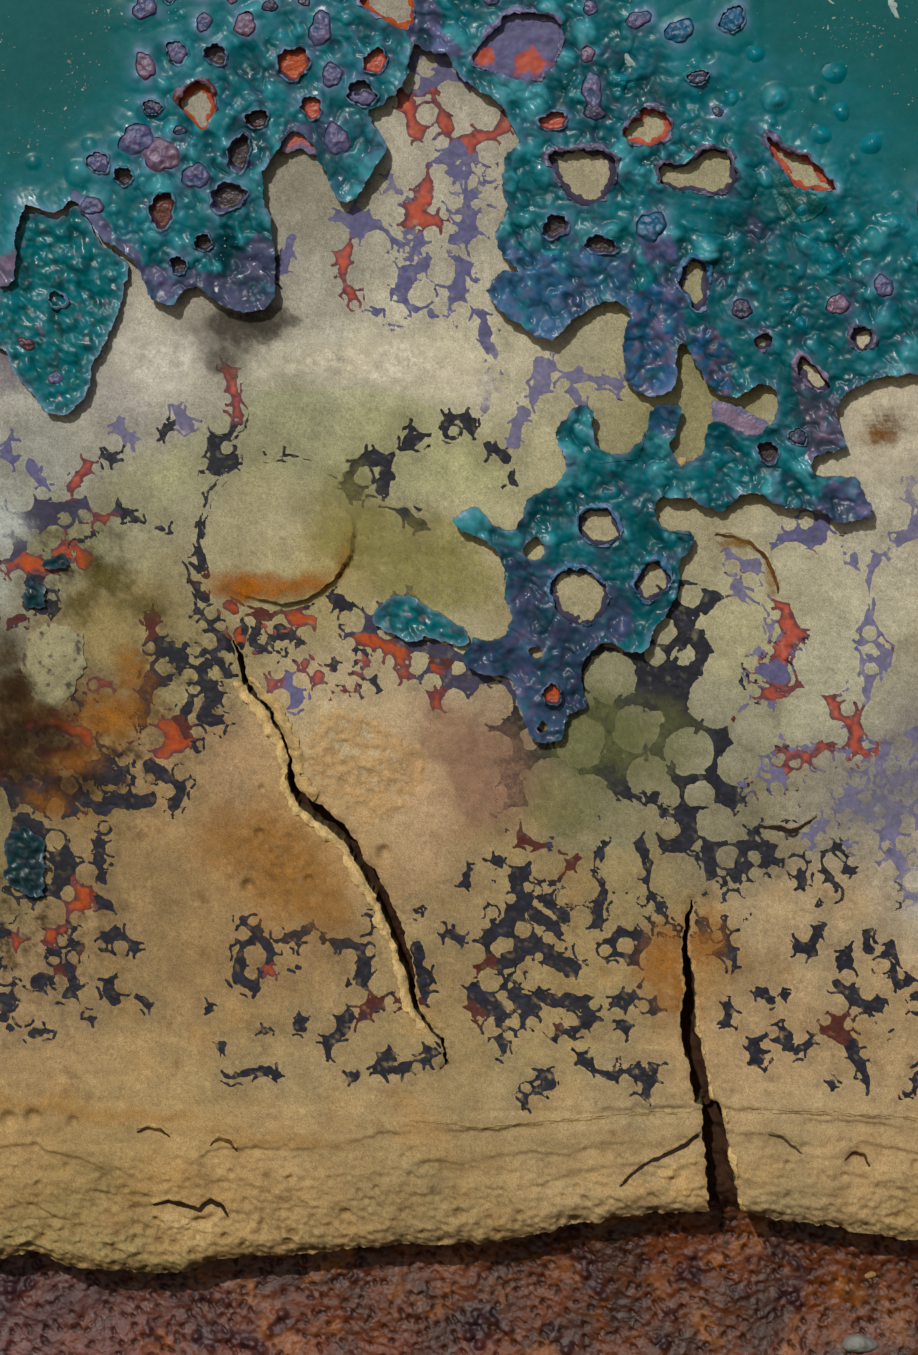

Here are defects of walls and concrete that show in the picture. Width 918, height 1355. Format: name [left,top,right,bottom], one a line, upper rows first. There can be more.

rust [0,647,63,728]
peeling [0,47,918,1114]
crack [233,651,447,1059]
crack [408,900,918,1212]
rust [0,1199,918,1355]